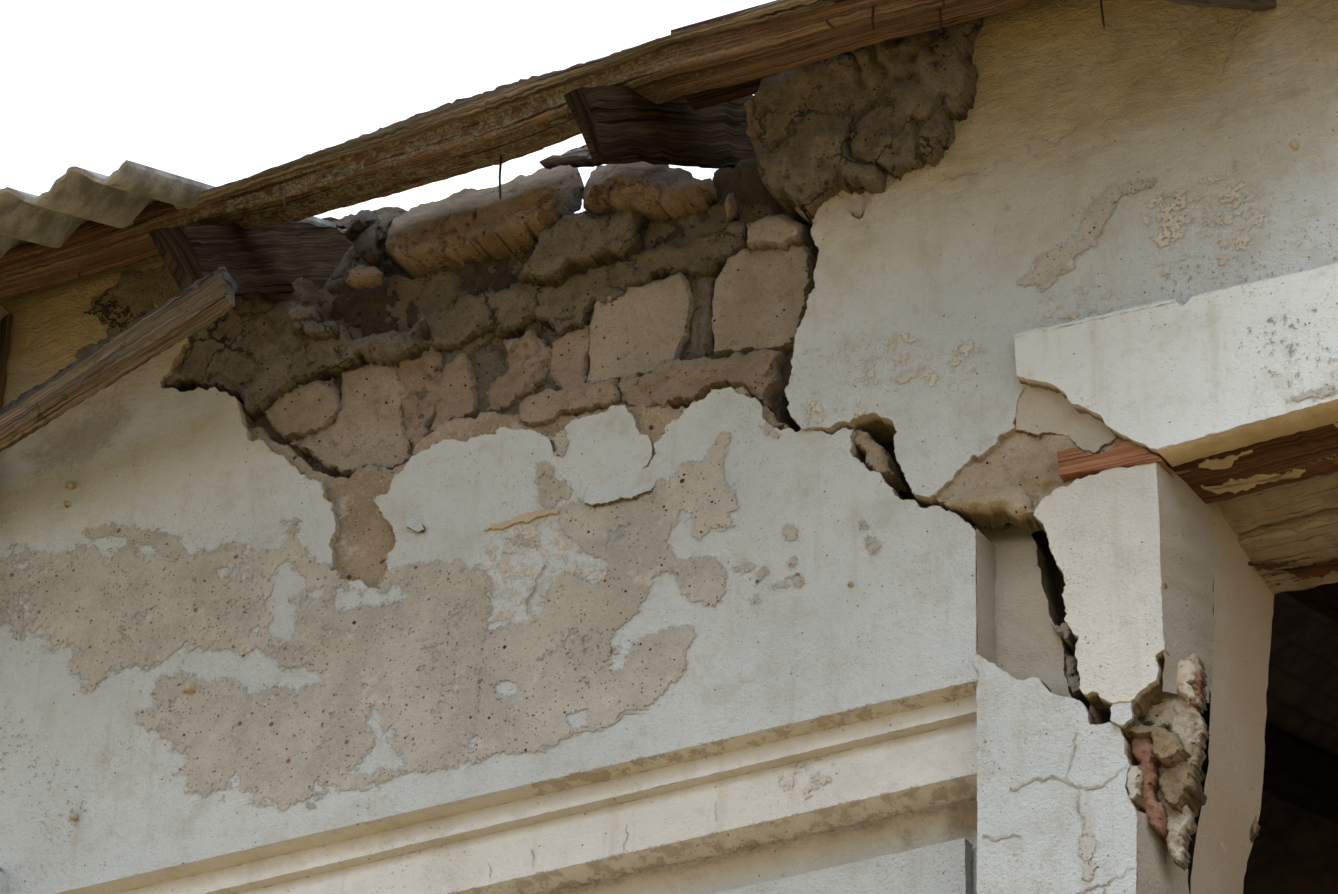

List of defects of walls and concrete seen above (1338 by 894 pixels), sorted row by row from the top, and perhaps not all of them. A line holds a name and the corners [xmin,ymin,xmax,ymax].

peeling [1016,173,1338,319]
peeling [1238,287,1338,403]
flaking render [0,157,925,810]
crack [853,429,923,508]
flaking render [935,385,1174,534]
crack [968,522,1128,836]
crack [983,833,1022,841]
crack [1076,867,1133,894]
flaking render [1110,653,1210,871]
flaking render [1249,816,1261,842]